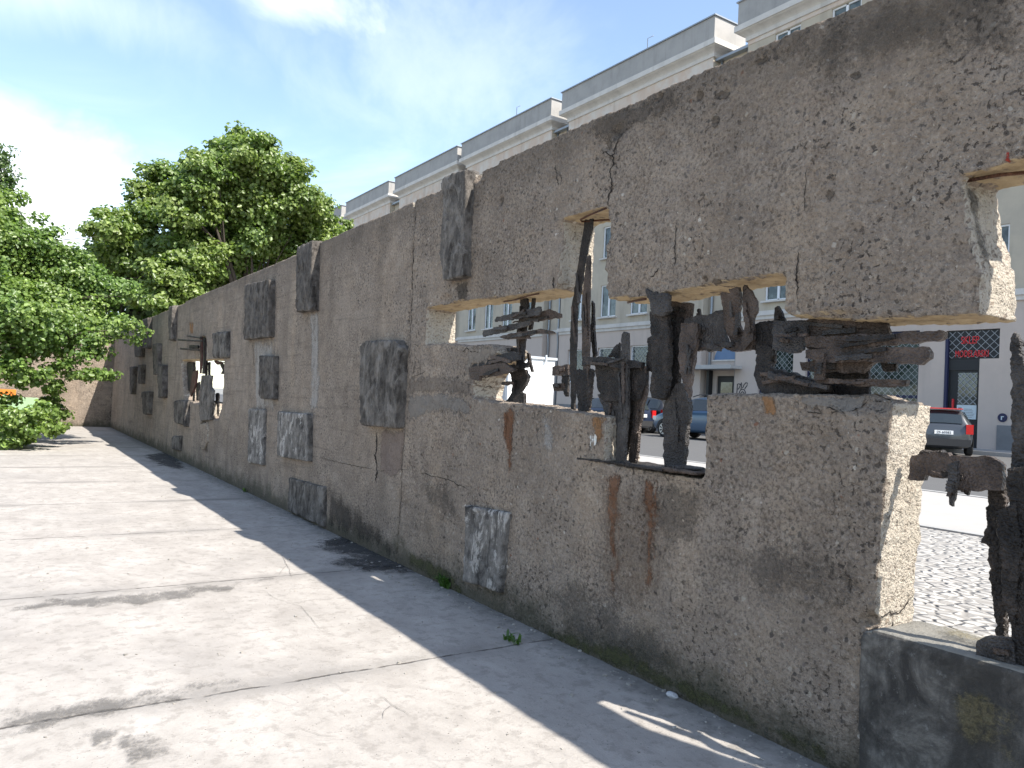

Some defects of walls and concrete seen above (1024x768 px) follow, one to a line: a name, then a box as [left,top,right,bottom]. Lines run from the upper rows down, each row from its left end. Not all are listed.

crack [602,140,618,203]
water stain [323,495,401,572]
crack [325,433,467,534]
rust [503,408,514,471]
rust [606,474,621,594]
rust [641,480,658,586]